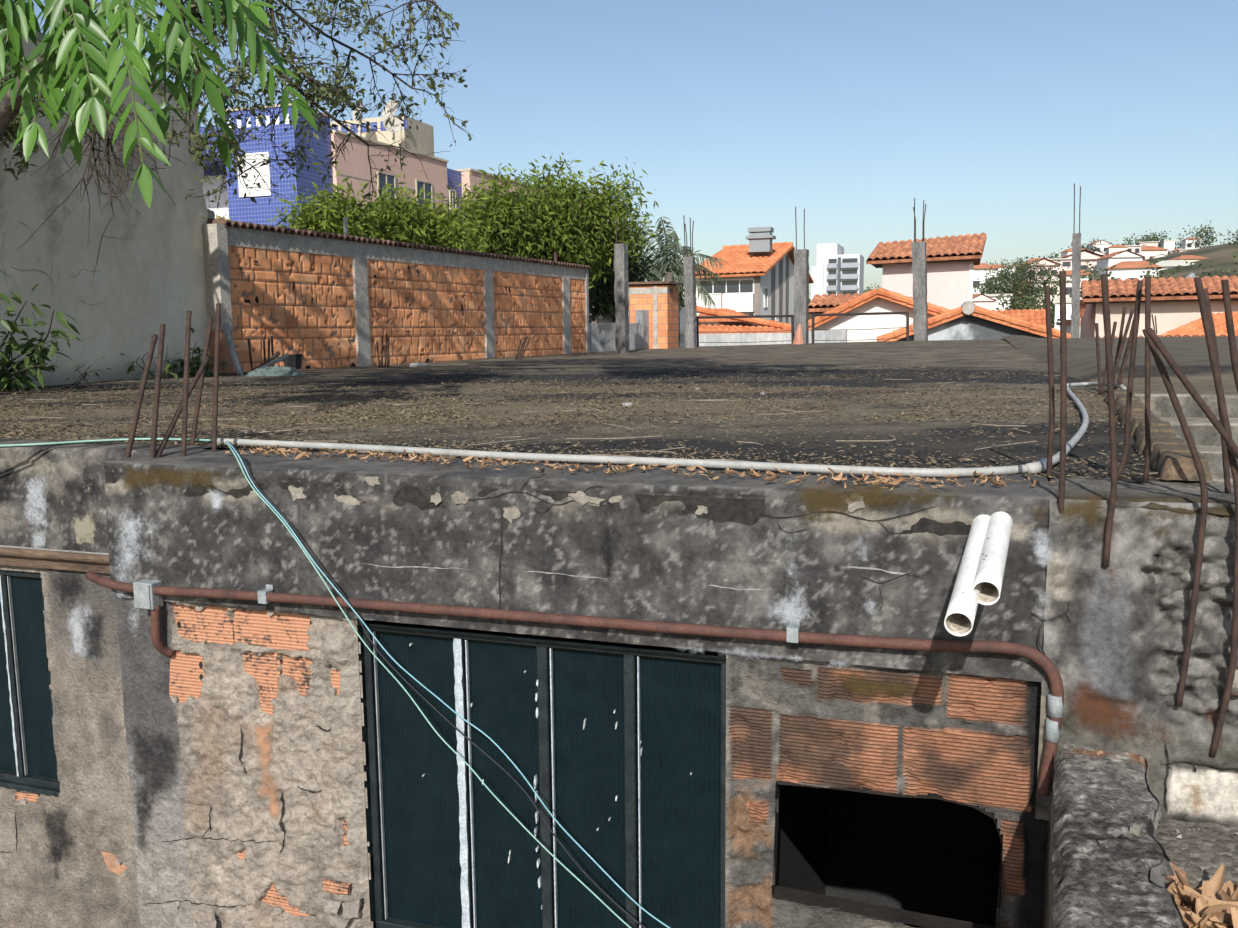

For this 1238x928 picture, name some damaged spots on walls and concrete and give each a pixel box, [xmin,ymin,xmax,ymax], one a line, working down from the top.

efflorescence [25,479,47,548]
peeling [430,491,470,505]
peeling [503,506,521,524]
peeling [568,491,623,506]
crack [763,505,941,534]
spalling [169,603,313,715]
spalling [329,666,341,696]
crack [239,730,247,774]
damp [134,736,173,844]
crack [162,786,321,853]
damp [44,812,71,877]
crack [143,900,254,928]